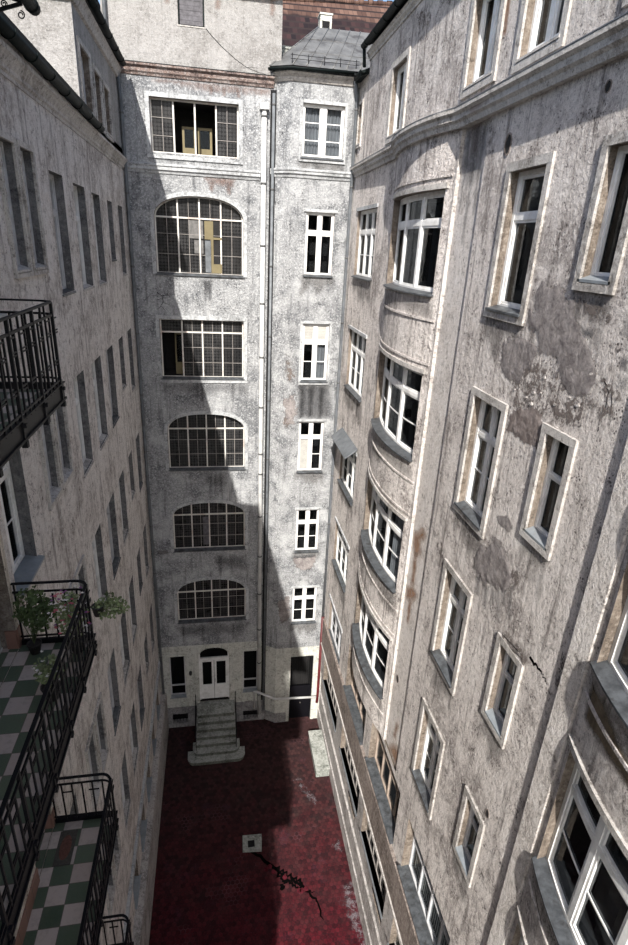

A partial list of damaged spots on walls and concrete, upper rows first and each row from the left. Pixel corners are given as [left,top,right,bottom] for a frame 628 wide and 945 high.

crack [251,852,324,920]